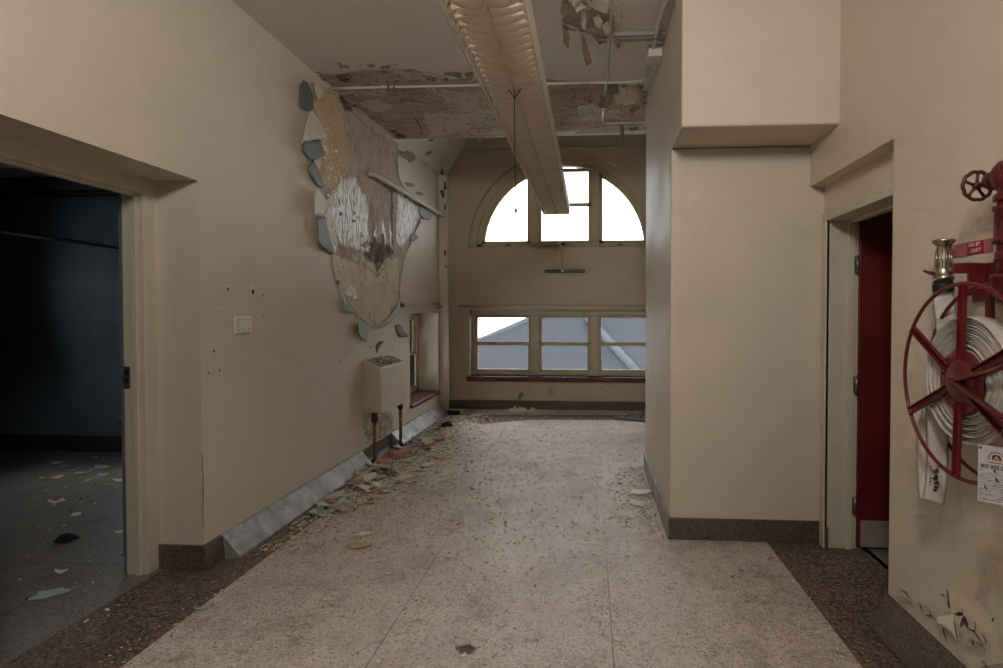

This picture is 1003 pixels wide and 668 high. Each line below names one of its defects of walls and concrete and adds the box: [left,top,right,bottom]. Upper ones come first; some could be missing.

peeling [560,0,622,66]
peeling [546,79,648,141]
peeling [298,62,505,353]